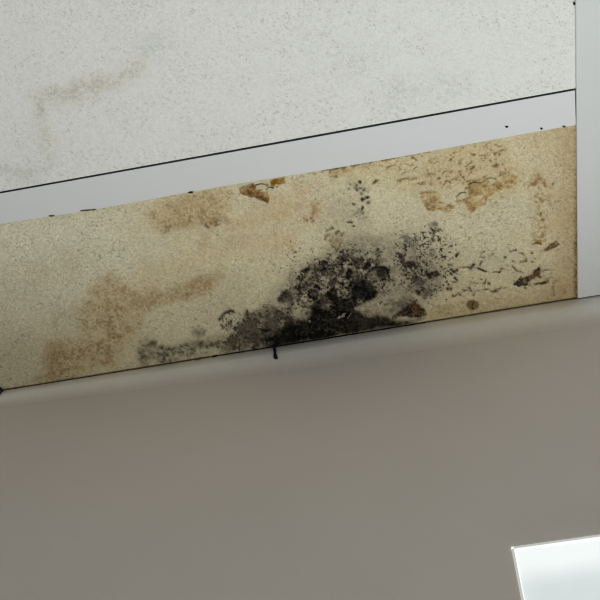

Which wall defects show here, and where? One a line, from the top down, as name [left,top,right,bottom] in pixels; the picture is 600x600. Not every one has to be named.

peeling [386,144,518,214]
water stain [6,223,577,390]